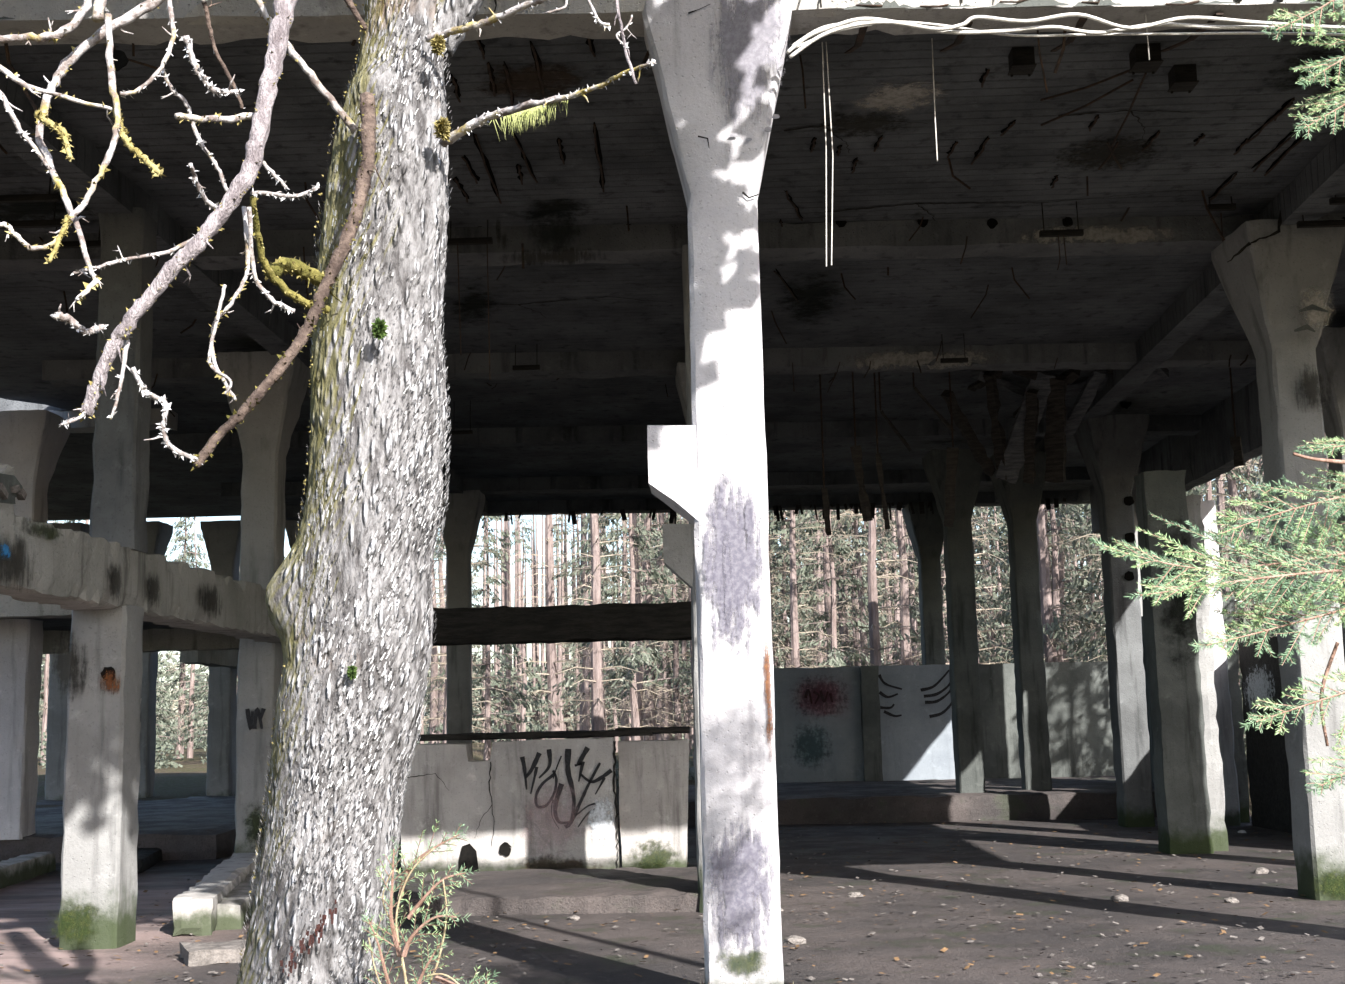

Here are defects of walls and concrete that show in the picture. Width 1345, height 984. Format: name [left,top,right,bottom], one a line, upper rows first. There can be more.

spalling [843,0,1123,10]
leakage [496,199,600,265]
crack [1228,210,1282,262]
leakage [0,537,34,586]
leakage [110,565,122,595]
leakage [146,573,159,606]
leakage [199,585,222,616]
corrosion [100,671,120,695]